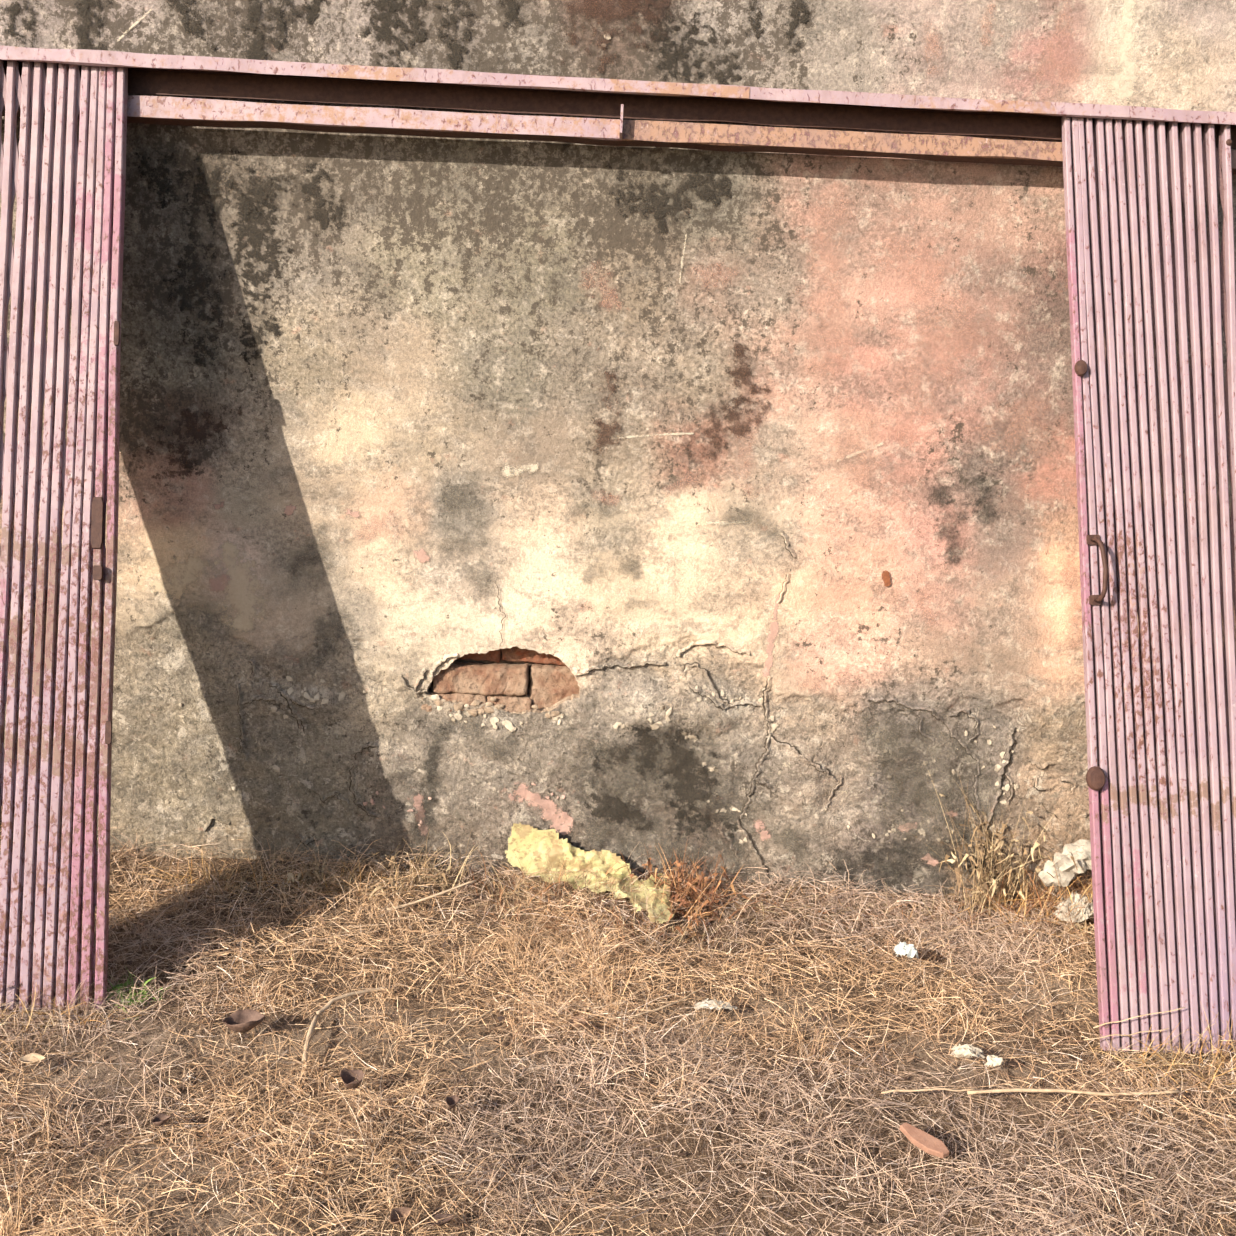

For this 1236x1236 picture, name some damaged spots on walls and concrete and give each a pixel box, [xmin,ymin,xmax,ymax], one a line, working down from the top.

damp [230,0,327,60]
damp [362,0,477,71]
damp [560,0,742,85]
damp [135,144,349,383]
damp [590,340,777,464]
crack [776,532,797,604]
crack [236,659,321,761]
spalling [421,646,580,732]
crack [312,741,380,818]
damp [576,723,800,864]
crack [575,639,843,886]
crack [860,887,903,895]